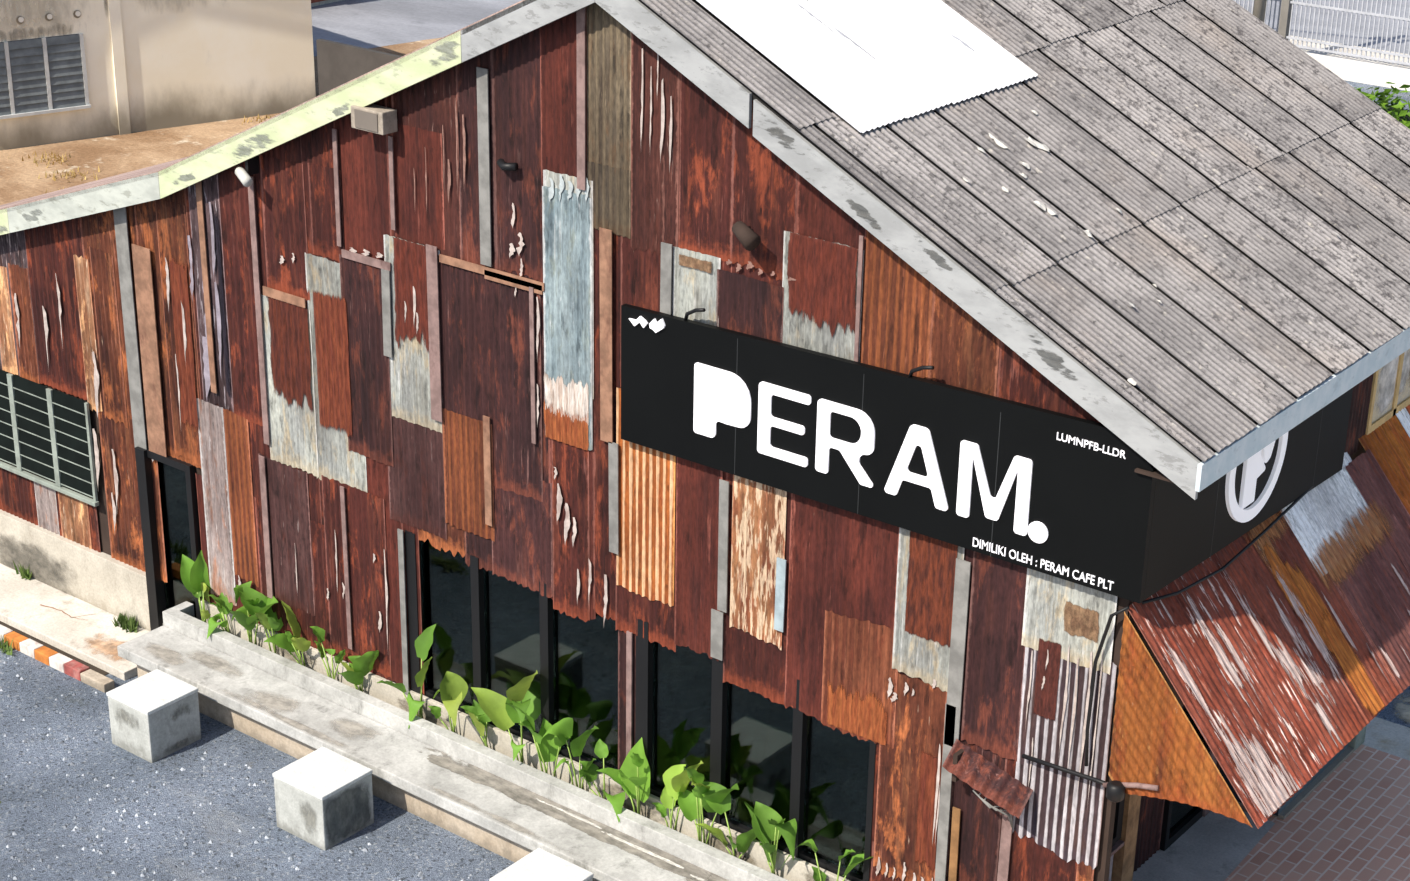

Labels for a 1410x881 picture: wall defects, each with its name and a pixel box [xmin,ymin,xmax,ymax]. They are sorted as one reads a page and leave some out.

rust [169,256,199,429]
rust [268,291,352,437]
rust [393,237,429,351]
rust [544,400,589,450]
water stain [1378,351,1410,413]
rust [827,682,887,745]
rust [905,531,958,647]
rust [1033,601,1099,721]
rust [1248,504,1390,715]
rust [915,751,941,871]